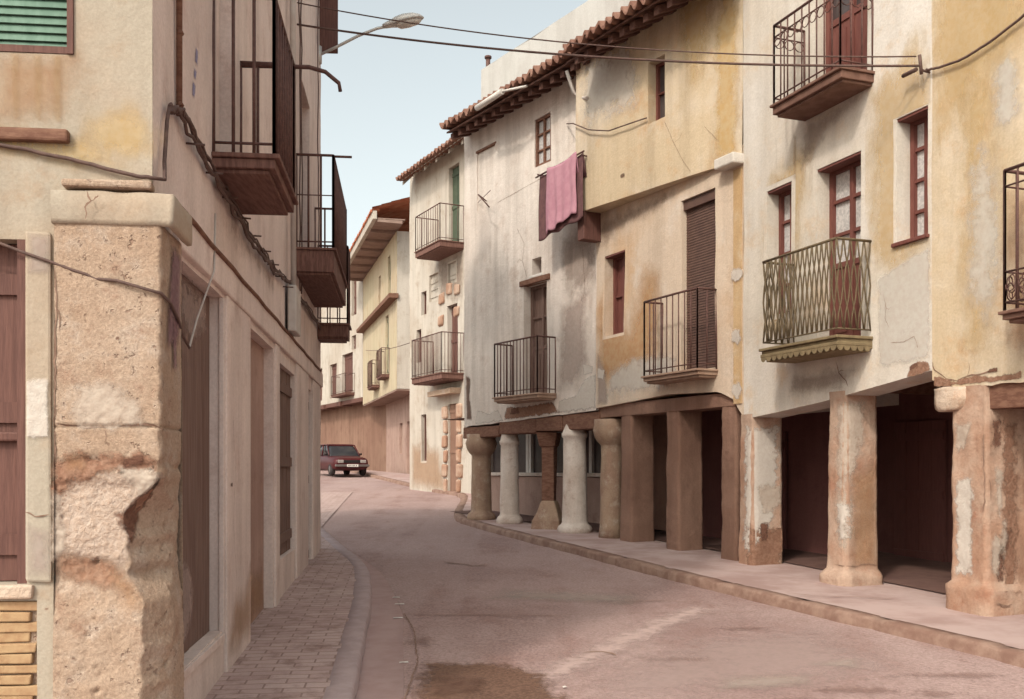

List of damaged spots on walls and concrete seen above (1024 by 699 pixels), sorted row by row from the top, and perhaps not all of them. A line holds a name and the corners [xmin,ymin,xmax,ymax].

flaking render [31,238,46,270]
flaking render [26,379,48,438]
peeling [956,423,970,450]
spalling [907,361,1021,387]
spalling [33,450,157,568]
peeling [743,425,782,566]
peeling [954,478,974,575]
peeling [992,419,1020,593]